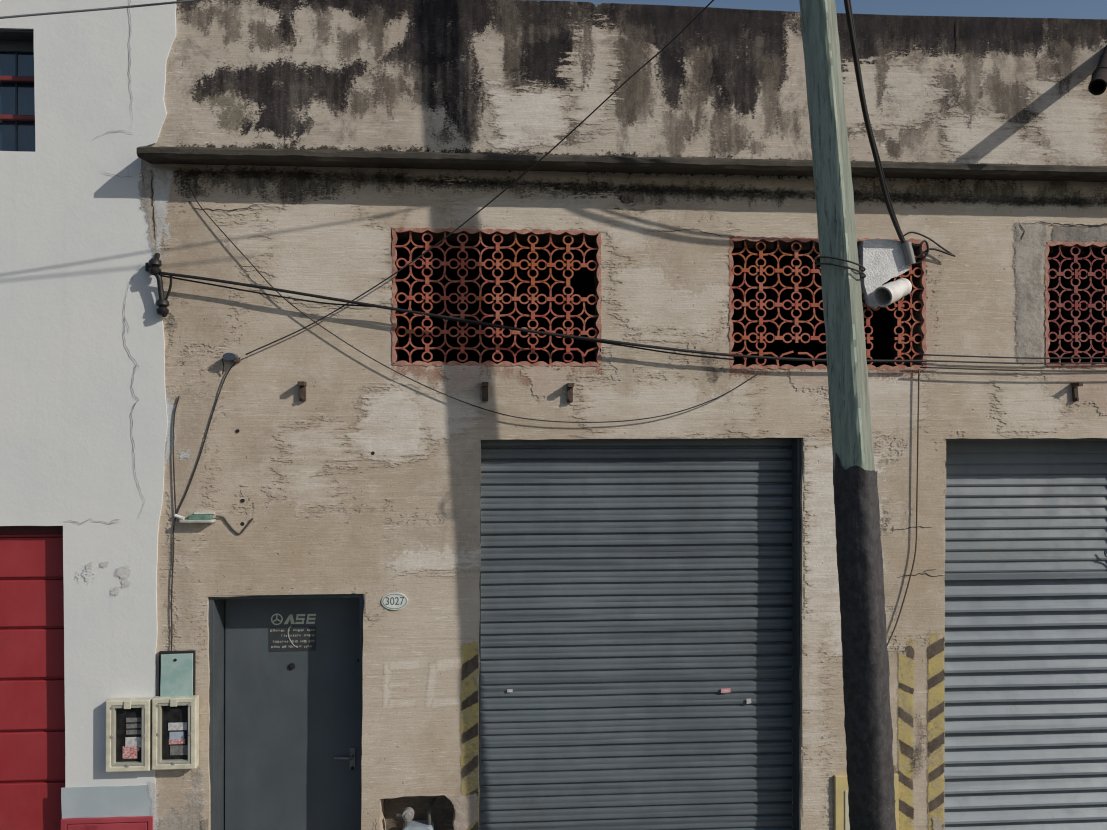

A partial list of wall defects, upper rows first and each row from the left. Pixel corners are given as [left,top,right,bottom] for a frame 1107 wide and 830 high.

crack [95,0,133,138]
damp [176,0,802,159]
damp [836,13,1107,166]
crack [101,168,156,240]
damp [853,178,1107,211]
crack [66,265,145,524]
damp [151,165,815,663]
flaking render [446,793,479,830]